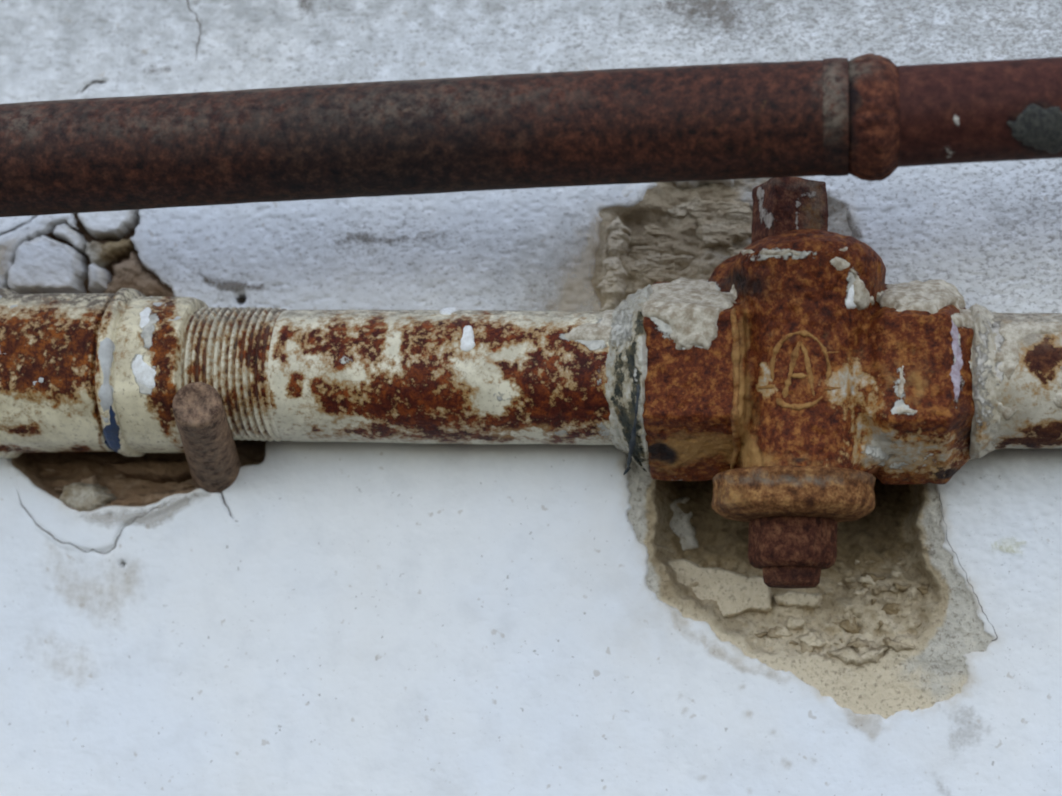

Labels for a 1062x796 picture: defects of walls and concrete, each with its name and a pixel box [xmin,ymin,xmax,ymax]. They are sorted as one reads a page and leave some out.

crack [0,210,175,297]
flaking render [590,178,770,312]
flaking render [827,195,852,236]
crack [16,489,170,554]
flaking render [11,451,199,525]
flaking render [234,439,266,467]
flaking render [623,384,998,719]